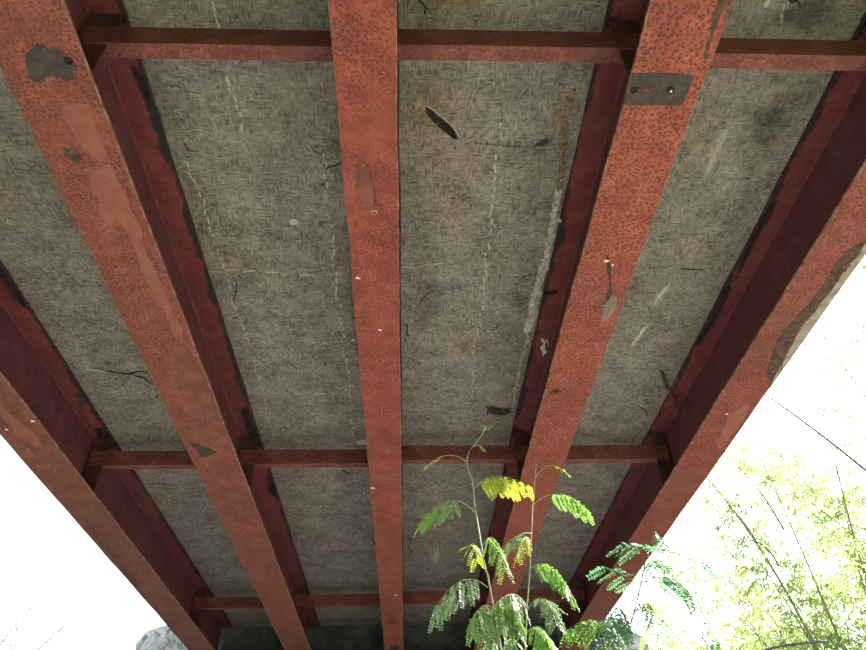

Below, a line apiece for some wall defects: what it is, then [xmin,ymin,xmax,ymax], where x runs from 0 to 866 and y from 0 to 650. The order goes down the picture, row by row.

peeling [25,44,78,83]
peeling [59,103,184,344]
crack [100,369,155,385]